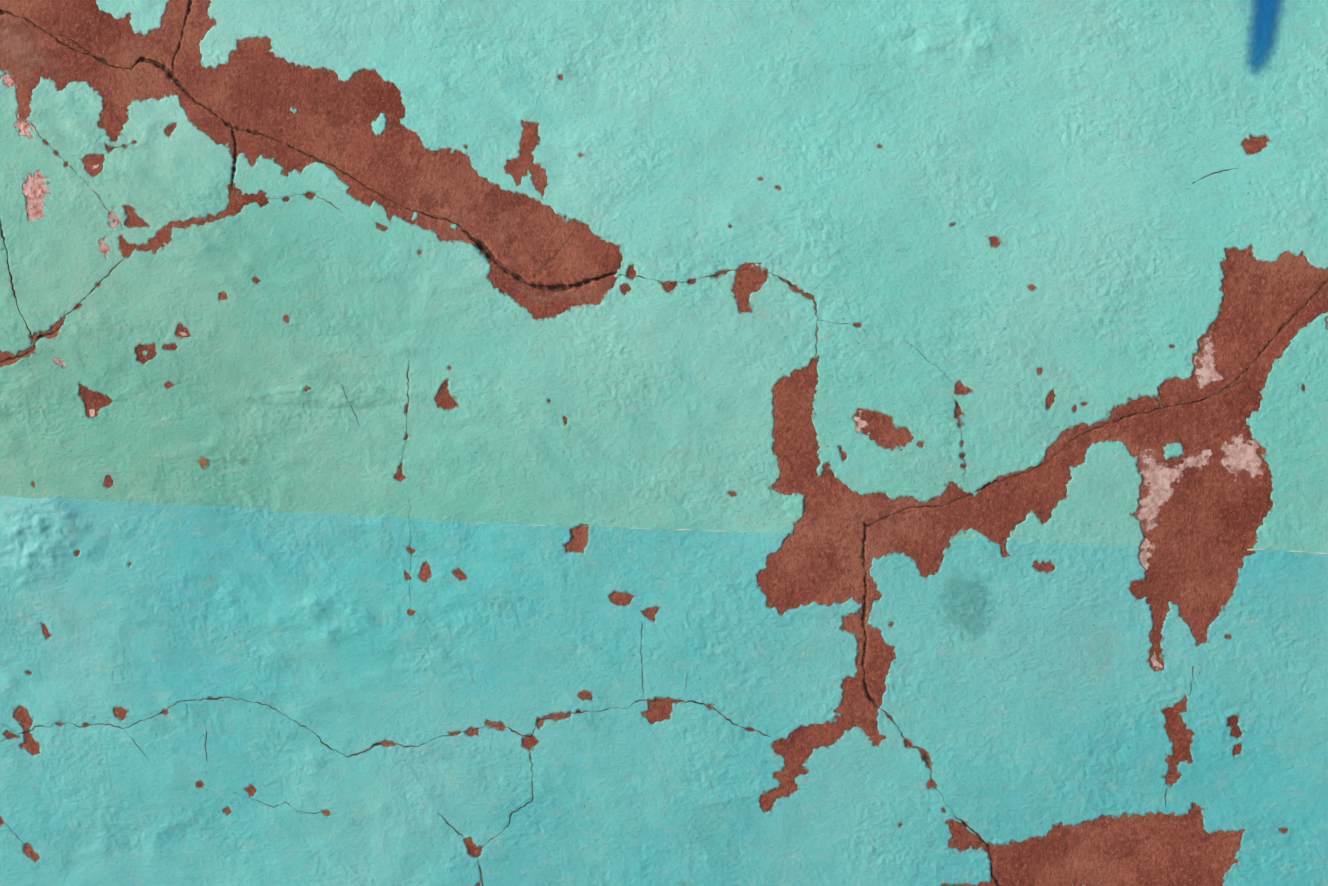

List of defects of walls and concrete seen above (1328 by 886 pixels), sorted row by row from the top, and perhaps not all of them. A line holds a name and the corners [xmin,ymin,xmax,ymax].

peeling [79,383,113,417]
peeling [0,0,623,320]
crack [395,351,411,598]
crack [0,0,849,367]
peeling [732,262,768,313]
peeling [757,246,1328,812]
crack [861,279,1328,886]
peeling [1242,135,1270,154]
crack [2,627,772,886]
peeling [941,803,1244,886]